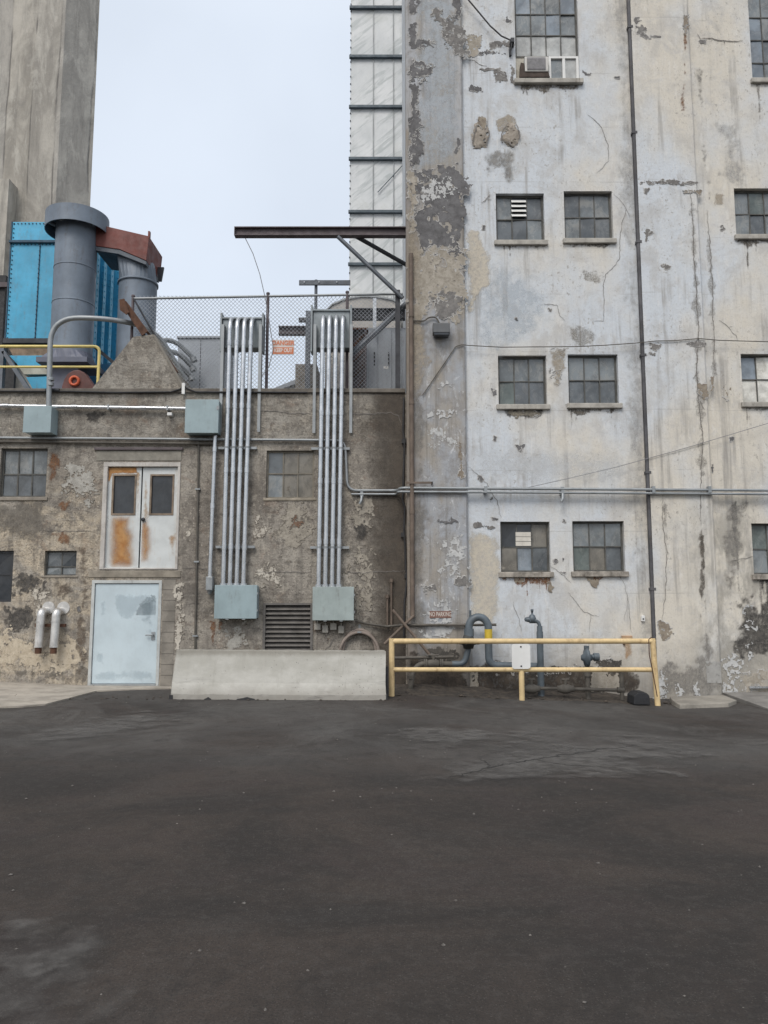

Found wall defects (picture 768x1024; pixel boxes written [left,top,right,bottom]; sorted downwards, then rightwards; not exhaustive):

peeling [405,0,521,332]
corrosion [108,468,139,481]
corrosion [113,519,148,565]
peeling [419,540,473,635]
peeling [721,601,768,692]